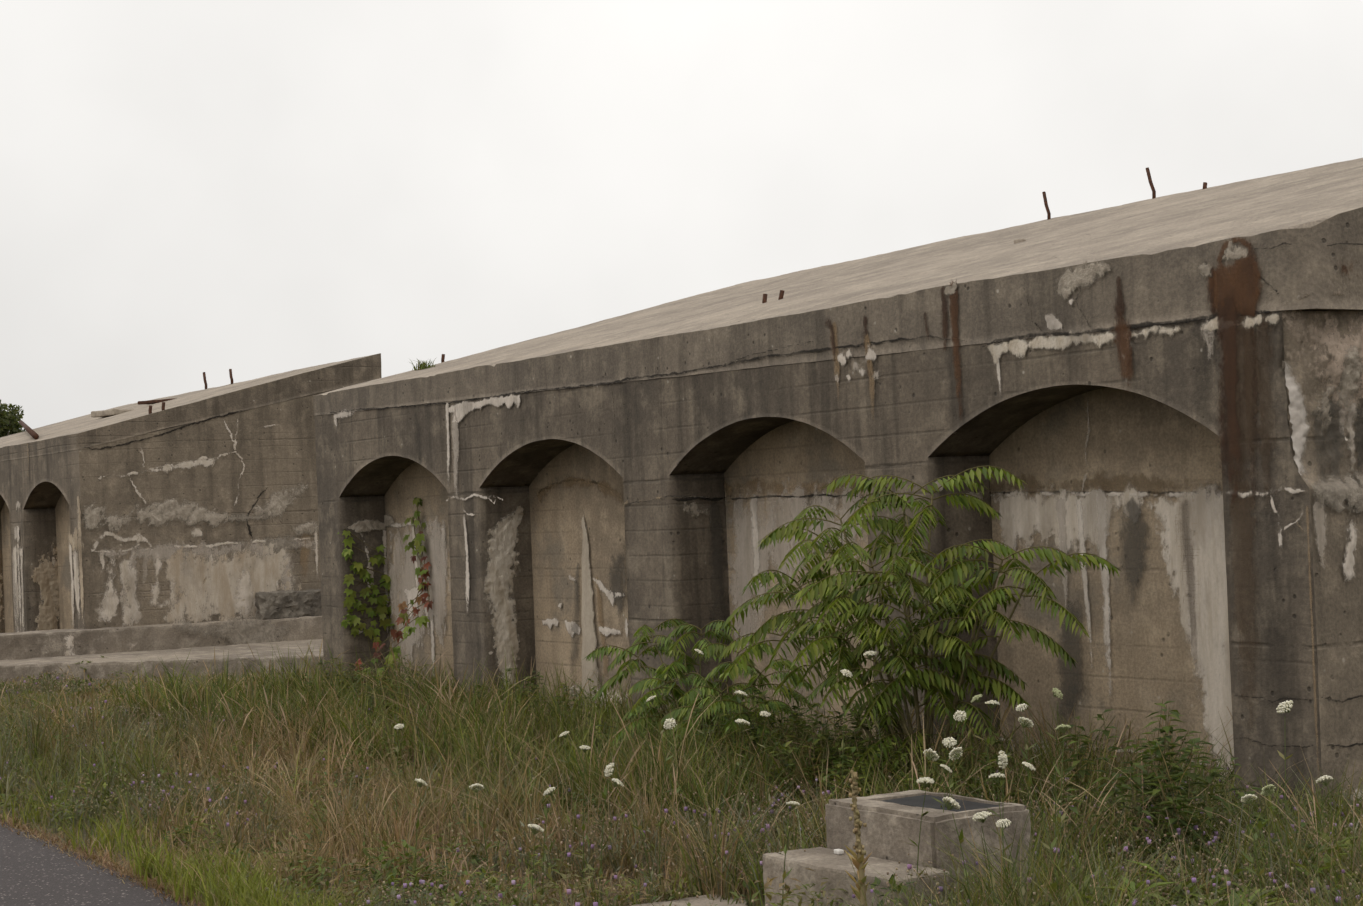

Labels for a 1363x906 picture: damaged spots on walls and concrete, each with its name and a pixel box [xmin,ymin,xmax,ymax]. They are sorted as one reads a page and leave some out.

crack [85,410,275,541]
crack [323,289,1280,432]
rust [924,281,963,416]
spalling [1045,315,1062,329]
spalling [1057,261,1110,305]
rust [1114,276,1133,385]
rust [1207,255,1272,580]
spalling [1282,294,1363,514]
peeling [0,526,60,632]
peeling [83,484,319,645]
peeling [484,506,524,689]
water stain [993,484,1235,795]